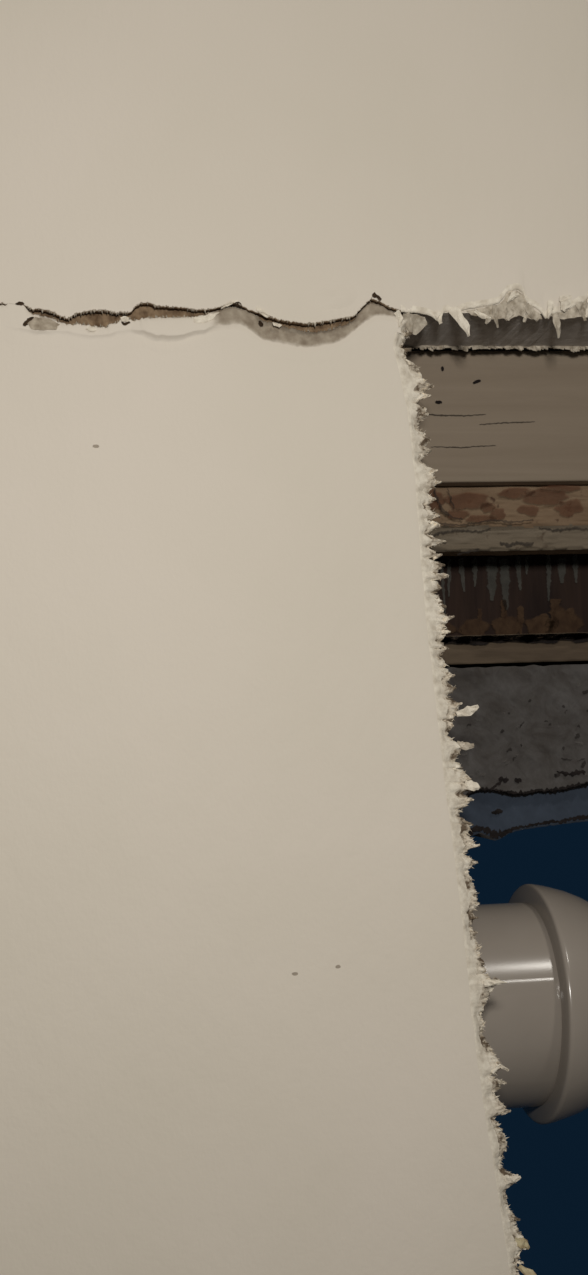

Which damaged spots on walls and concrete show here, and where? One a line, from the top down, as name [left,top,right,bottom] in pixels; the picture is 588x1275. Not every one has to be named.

crack [0,271,413,362]
spalling [467,809,588,839]